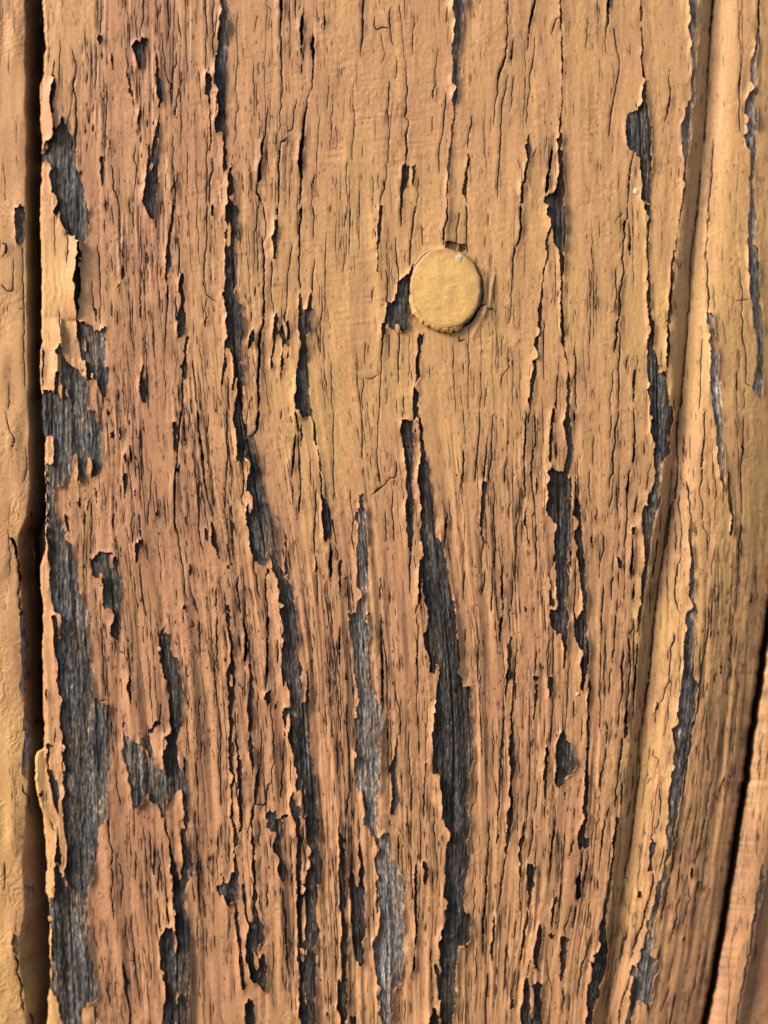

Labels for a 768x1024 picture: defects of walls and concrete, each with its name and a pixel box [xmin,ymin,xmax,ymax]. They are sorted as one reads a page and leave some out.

peeling [40,37,194,1024]
peeling [205,0,429,1024]
peeling [381,264,475,1024]
peeling [444,241,467,262]
peeling [496,636,570,1024]
peeling [528,0,604,850]
peeling [625,0,699,633]
peeling [625,518,699,1024]
peeling [743,26,765,399]